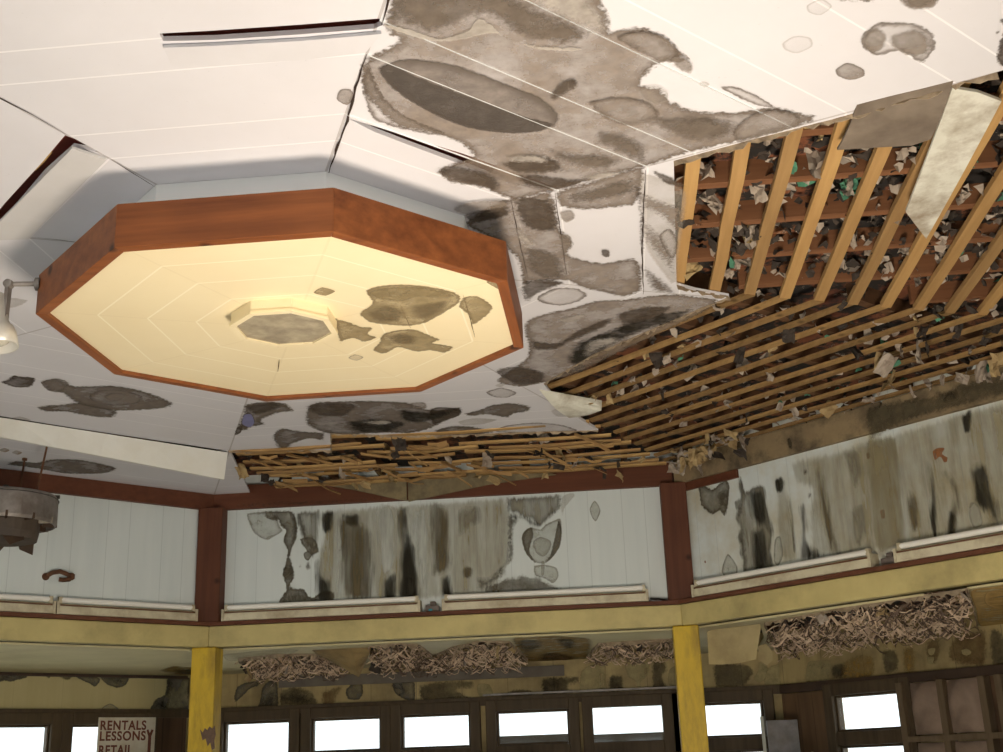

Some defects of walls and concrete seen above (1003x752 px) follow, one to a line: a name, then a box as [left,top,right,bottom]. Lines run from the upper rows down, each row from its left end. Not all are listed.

water stain [273,0,814,448]
peeling [683,262,703,281]
peeling [699,191,723,215]
peeling [724,222,761,279]
peeling [846,305,944,404]
peeling [939,336,1003,386]
water stain [2,375,172,417]
water stain [235,402,294,435]
peeling [667,416,751,476]
water stain [837,381,1003,545]
water stain [247,495,562,603]
water stain [699,478,819,575]